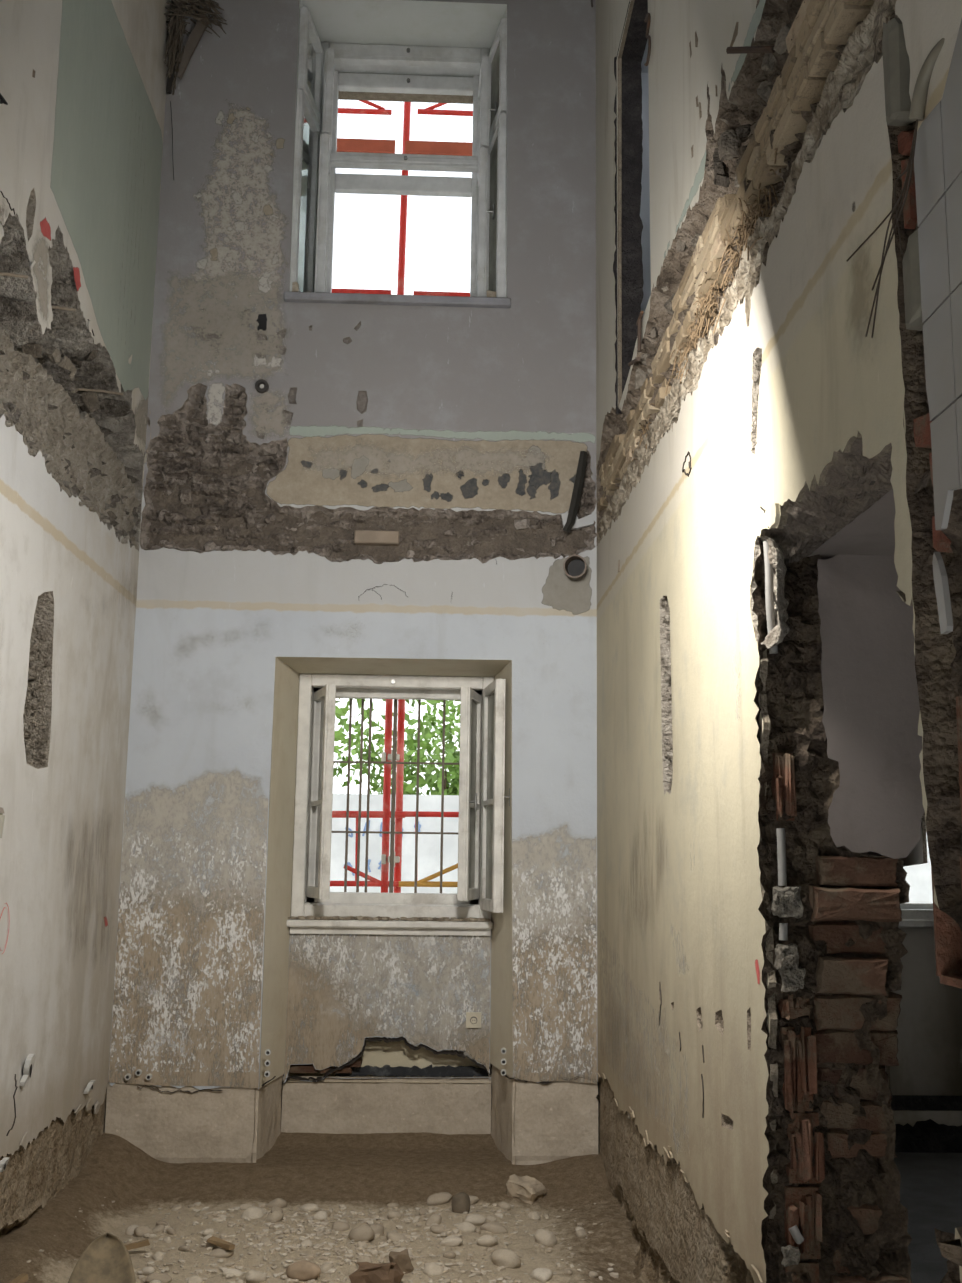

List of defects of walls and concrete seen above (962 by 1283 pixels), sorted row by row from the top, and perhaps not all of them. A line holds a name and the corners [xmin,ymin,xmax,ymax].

flaking render [26,188,36,241]
peeling [185,104,287,359]
spalling [597,0,899,545]
peeling [207,383,225,425]
peeling [252,387,587,514]
crack [137,1085,223,1093]
crack [261,1036,600,1102]
flaking render [614,1099,687,1182]
flaking render [721,1113,733,1130]
flaking render [749,1265,763,1283]